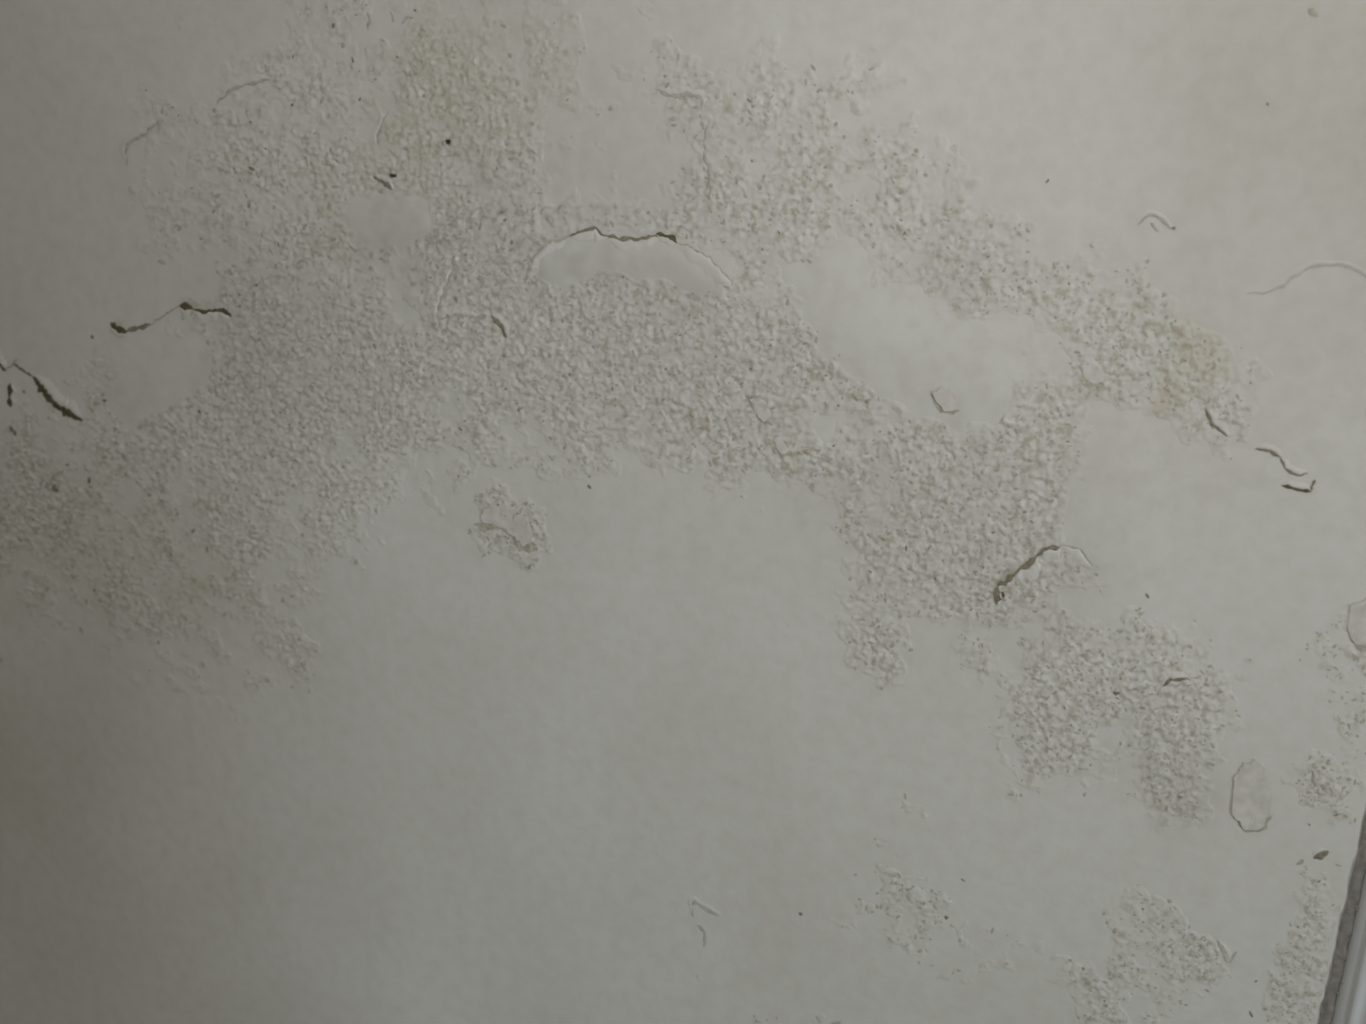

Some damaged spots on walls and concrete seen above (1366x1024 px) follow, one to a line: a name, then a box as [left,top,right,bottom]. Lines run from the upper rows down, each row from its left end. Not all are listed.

crack [524,226,734,289]
crack [90,283,258,339]
crack [431,260,510,338]
crack [0,349,83,436]
crack [49,464,91,492]
crack [1205,409,1316,493]
crack [993,545,1095,605]